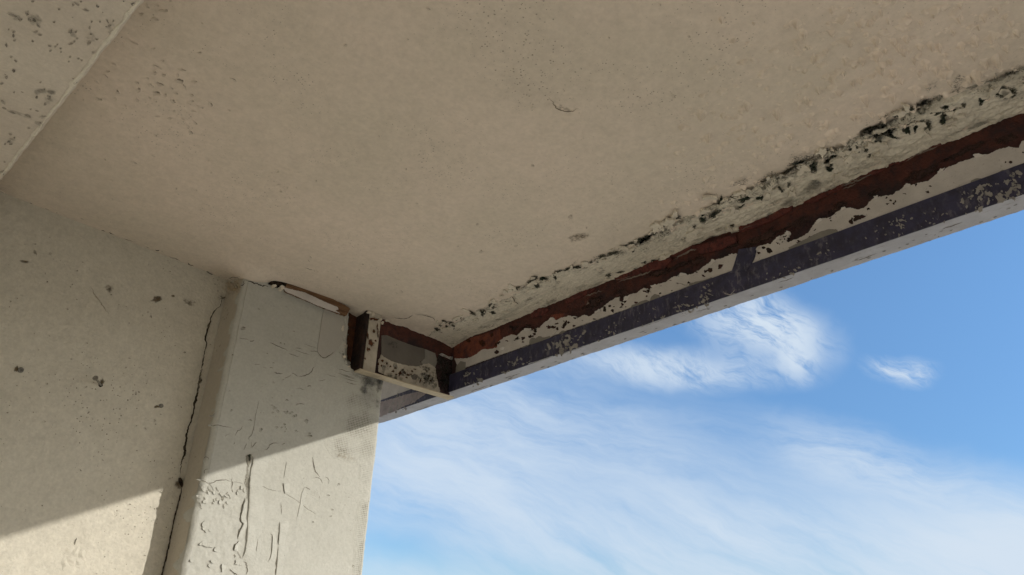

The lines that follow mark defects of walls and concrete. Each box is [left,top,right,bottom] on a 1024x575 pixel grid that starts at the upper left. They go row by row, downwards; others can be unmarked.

crack [160,280,337,575]
spalling [339,311,389,367]
corrosion [364,318,432,383]
peeling [379,381,432,417]
flaking render [429,67,1024,392]
corrosion [454,133,1017,359]